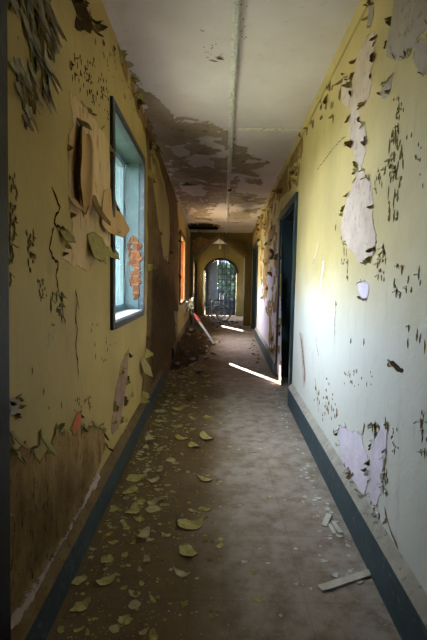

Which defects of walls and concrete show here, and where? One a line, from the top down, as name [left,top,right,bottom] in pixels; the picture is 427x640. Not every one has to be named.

crack [49,186,79,375]
spalling [9,0,427,403]
spalling [9,348,134,629]
peeling [314,377,399,520]